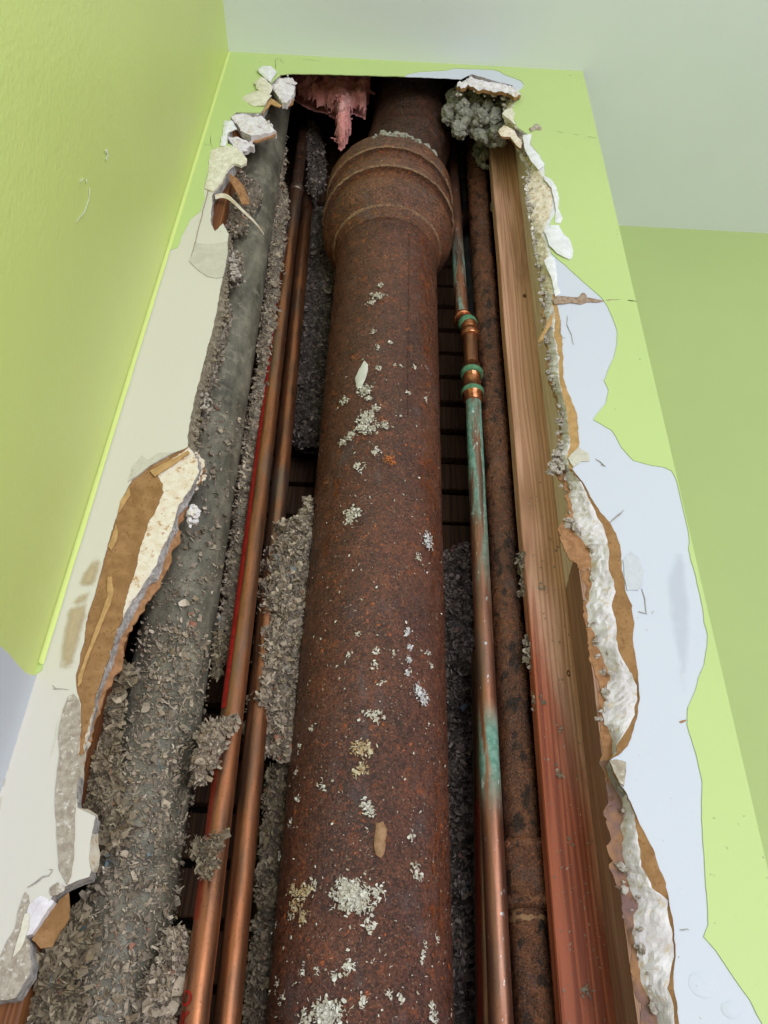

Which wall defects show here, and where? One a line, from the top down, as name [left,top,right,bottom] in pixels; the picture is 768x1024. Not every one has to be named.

peeling [0,65,376,1024]
peeling [405,69,762,1024]